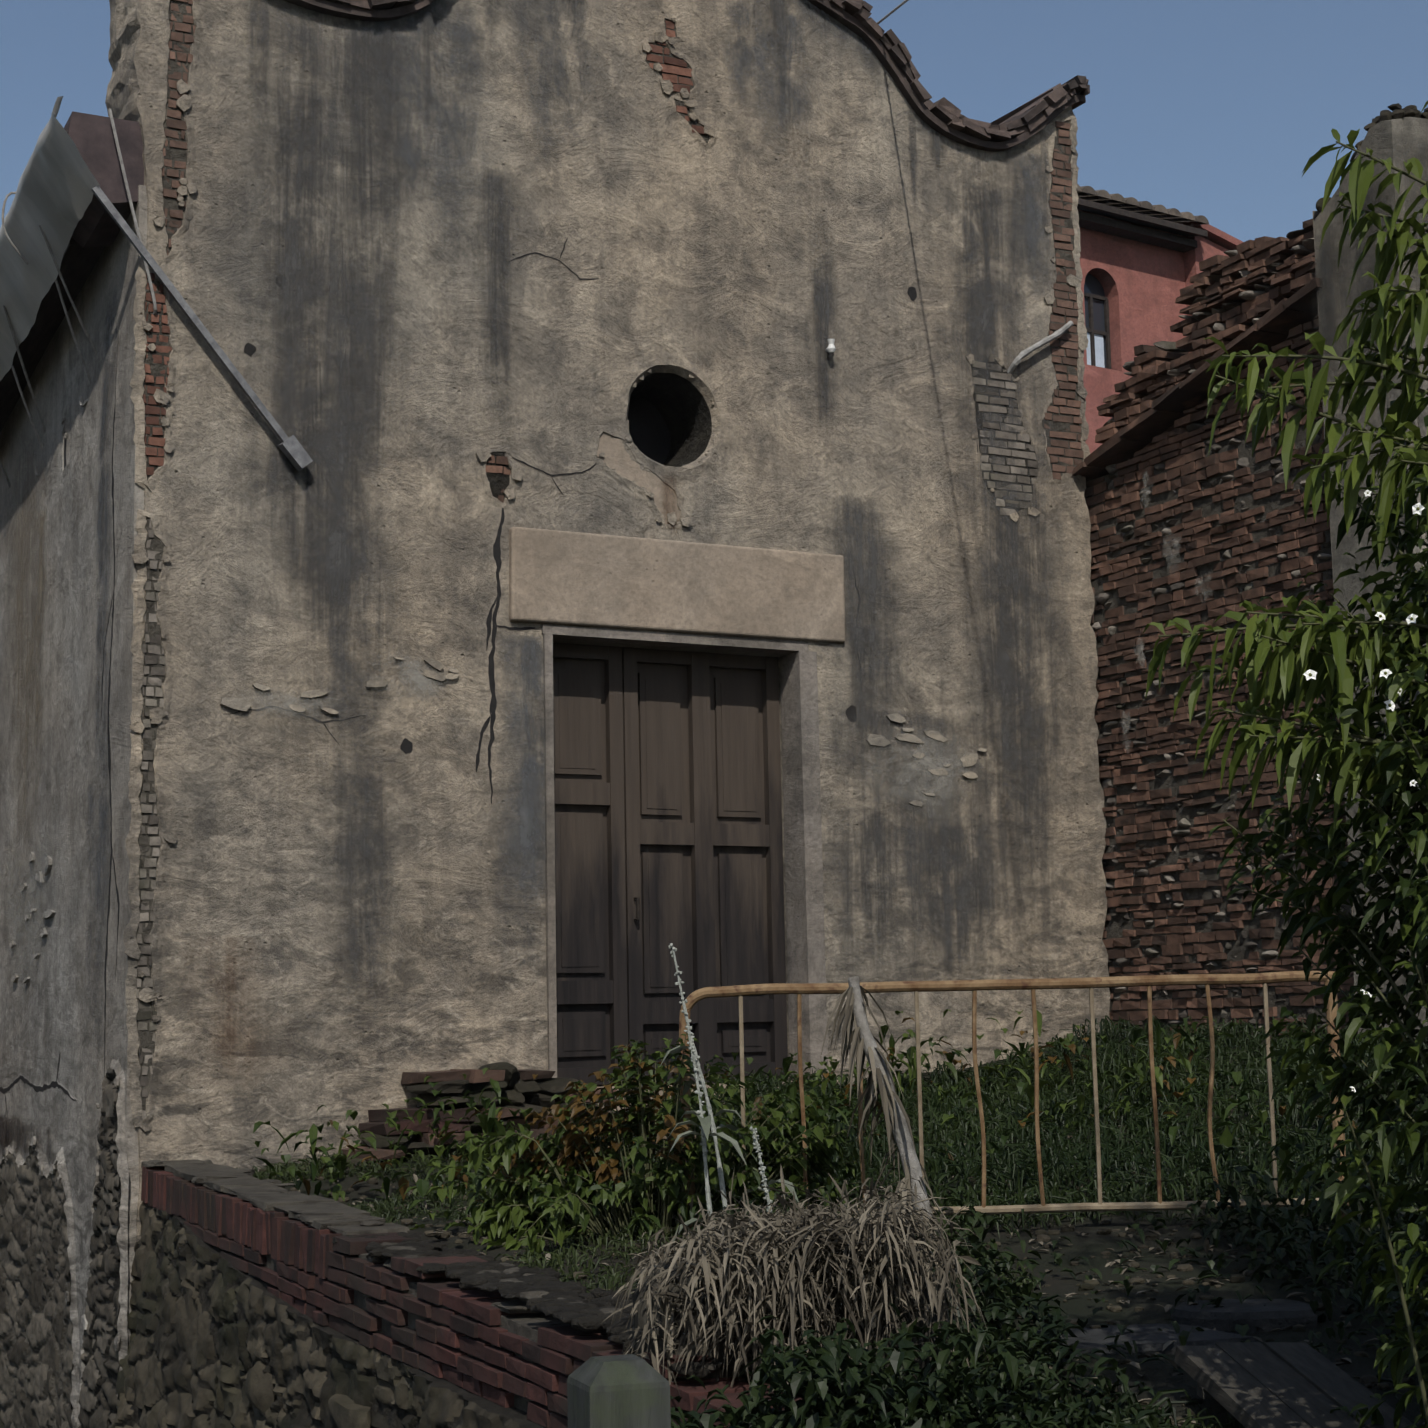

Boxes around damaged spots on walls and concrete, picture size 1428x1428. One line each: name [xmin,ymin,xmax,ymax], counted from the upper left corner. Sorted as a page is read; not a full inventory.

crack [101,330,121,1077]
flaking render [130,0,204,494]
leakage [266,0,474,722]
flaking render [476,445,523,510]
crack [474,508,536,804]
flaking render [637,12,718,151]
leakage [734,0,871,113]
leakage [839,499,993,952]
leakage [956,152,1052,826]
flaking render [965,115,1090,529]
crack [0,1052,77,1126]
flaking render [0,509,178,1428]